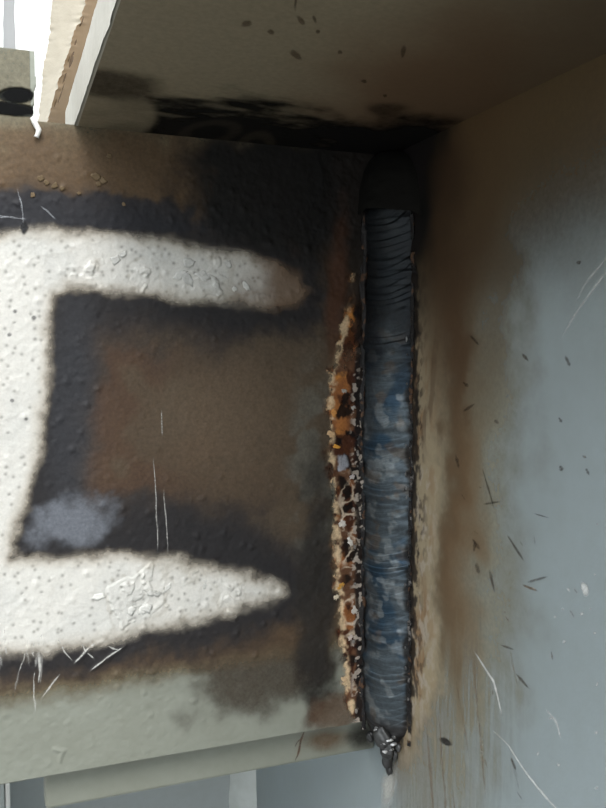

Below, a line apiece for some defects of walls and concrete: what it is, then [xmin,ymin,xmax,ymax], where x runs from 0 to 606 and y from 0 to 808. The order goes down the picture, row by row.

rust [324,297,364,723]